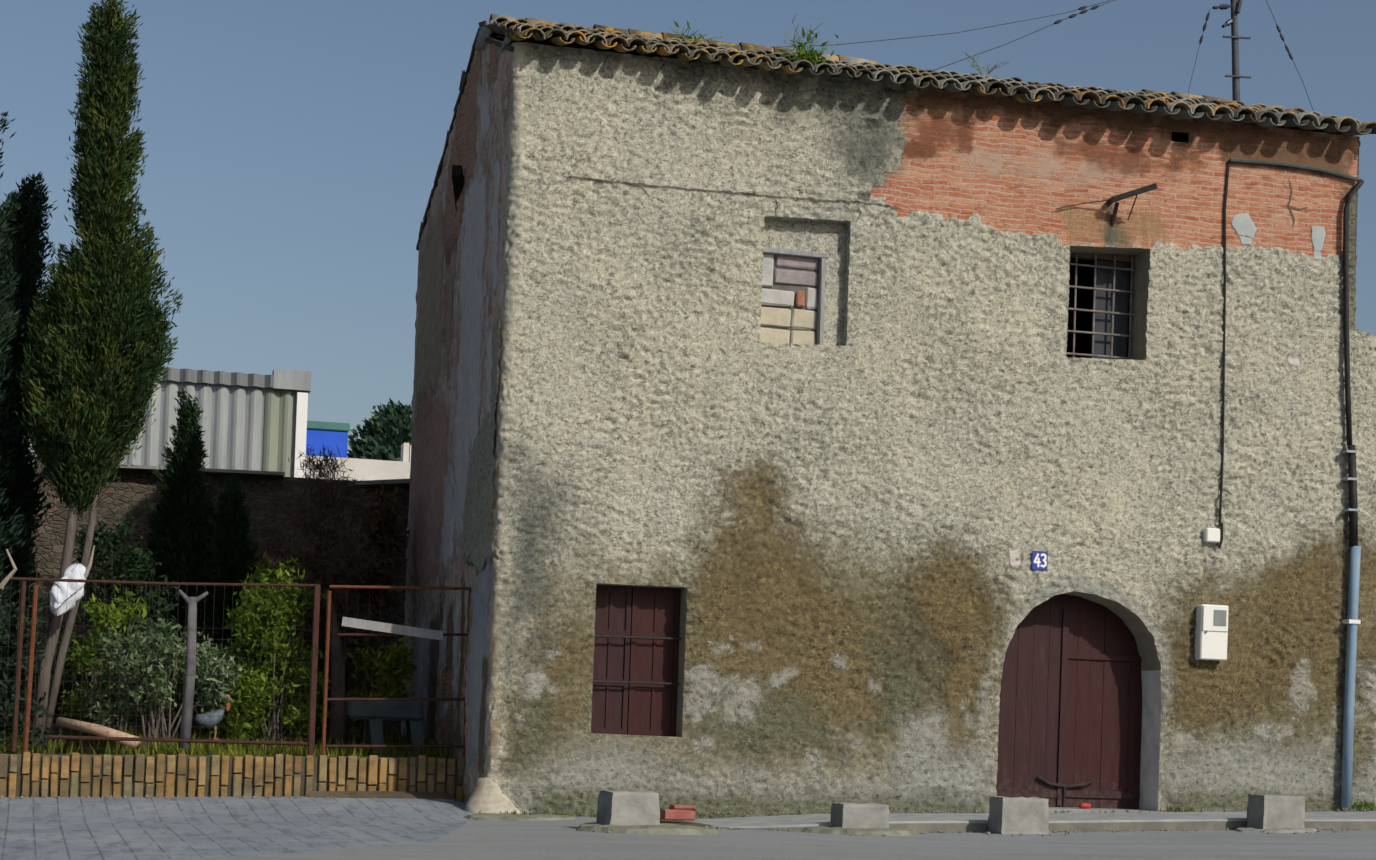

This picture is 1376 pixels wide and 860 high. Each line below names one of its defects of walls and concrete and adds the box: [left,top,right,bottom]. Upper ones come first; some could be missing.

spalling [870,89,1359,260]
flaking render [405,45,518,721]
leakage [512,473,994,819]
leakage [1169,545,1376,812]